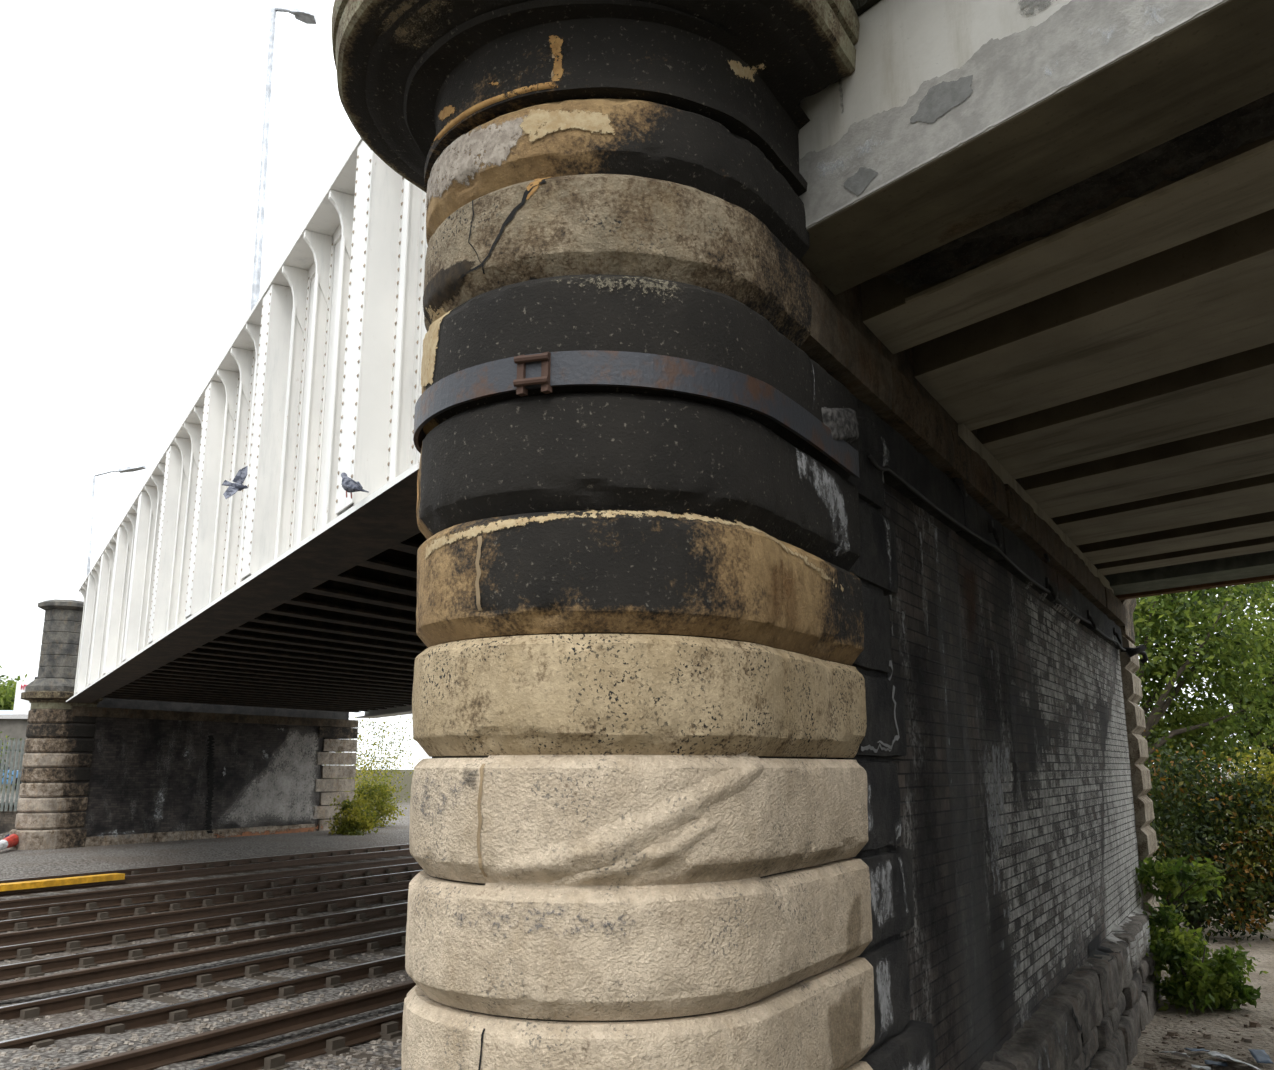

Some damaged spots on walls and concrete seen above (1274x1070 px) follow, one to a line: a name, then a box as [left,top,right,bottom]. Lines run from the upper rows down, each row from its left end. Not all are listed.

crack [454,177,552,291]
peeling [425,35,615,210]
peeling [799,0,1223,227]
water stain [947,582,1151,1042]